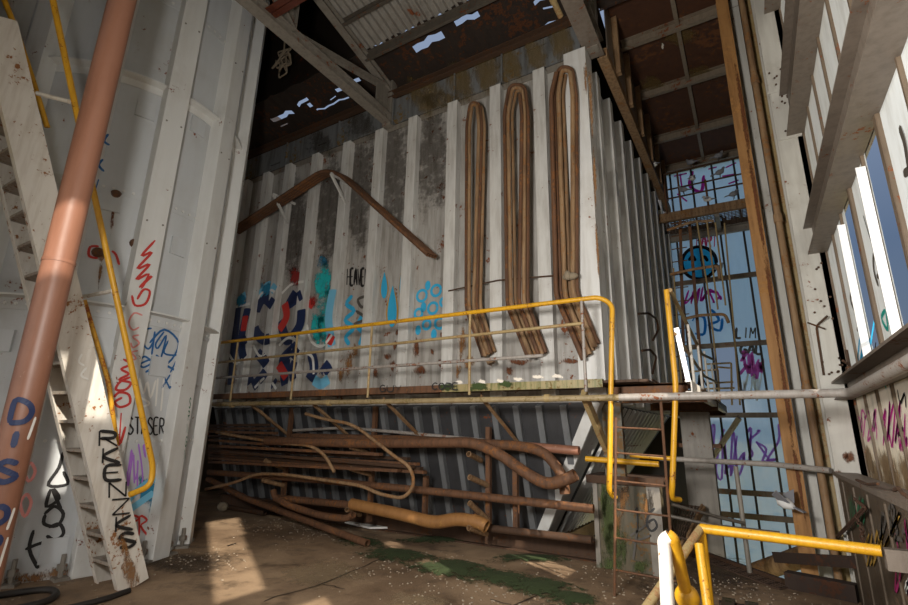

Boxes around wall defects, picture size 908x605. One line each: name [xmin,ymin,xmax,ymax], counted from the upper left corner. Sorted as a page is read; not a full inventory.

corrosion [734,65,806,520]
corrosion [121,538,140,589]